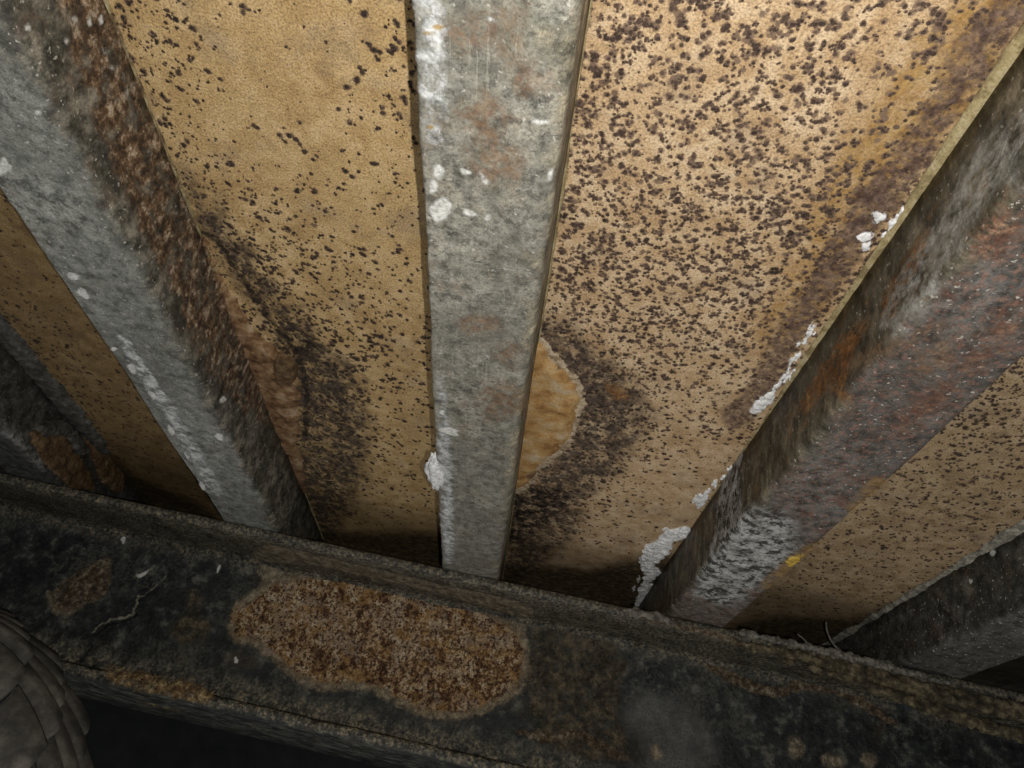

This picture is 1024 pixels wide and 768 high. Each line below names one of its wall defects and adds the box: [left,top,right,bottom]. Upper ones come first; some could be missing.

water stain [0,194,221,520]
water stain [112,0,455,569]
peeling [515,332,587,493]
water stain [503,0,1024,646]